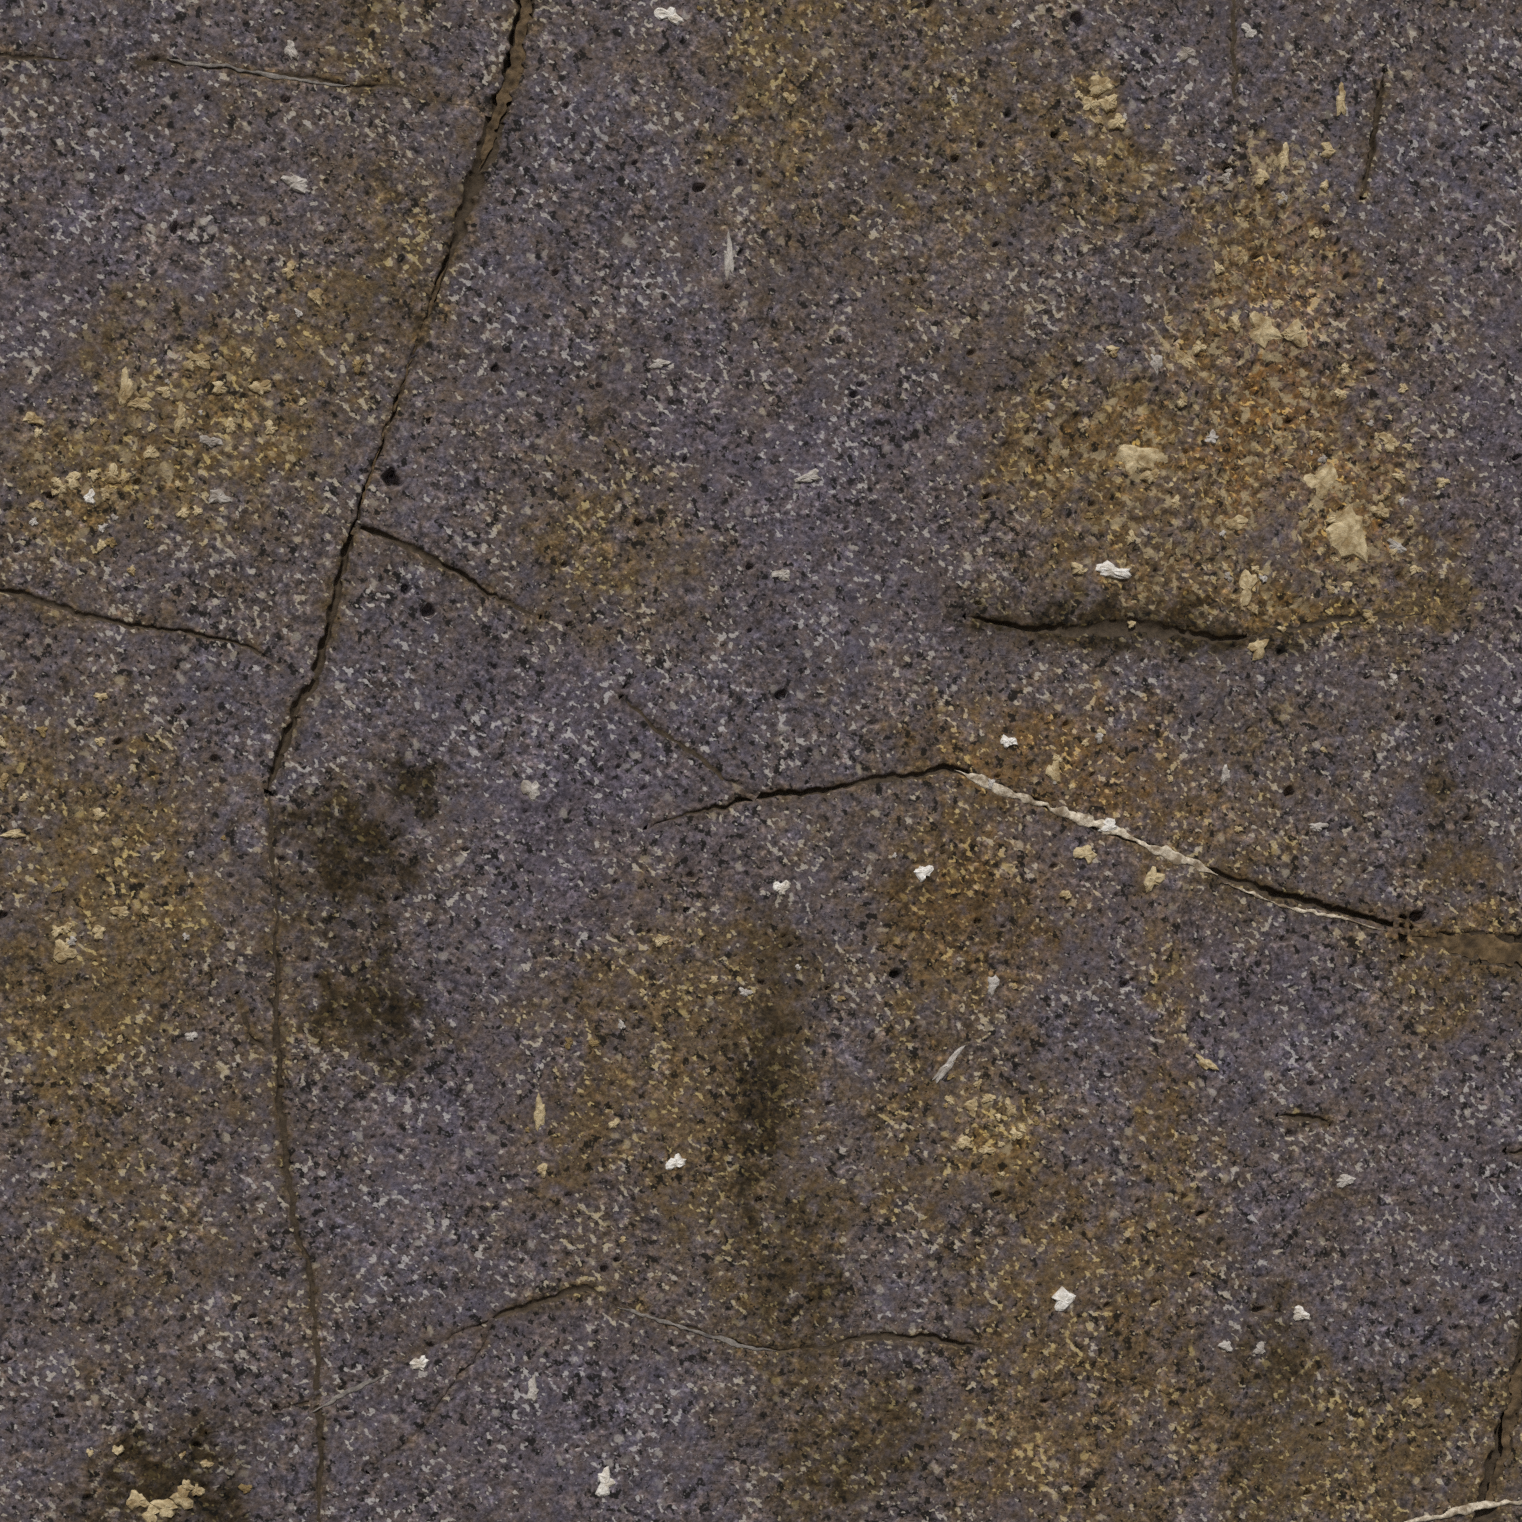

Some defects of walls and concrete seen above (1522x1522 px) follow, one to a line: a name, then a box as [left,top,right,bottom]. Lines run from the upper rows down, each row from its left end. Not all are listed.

crack [1227,0,1242,149]
crack [0,0,541,792]
crack [966,608,1422,648]
crack [619,694,1522,976]
crack [206,795,1224,1522]
crack [1405,1302,1522,1522]